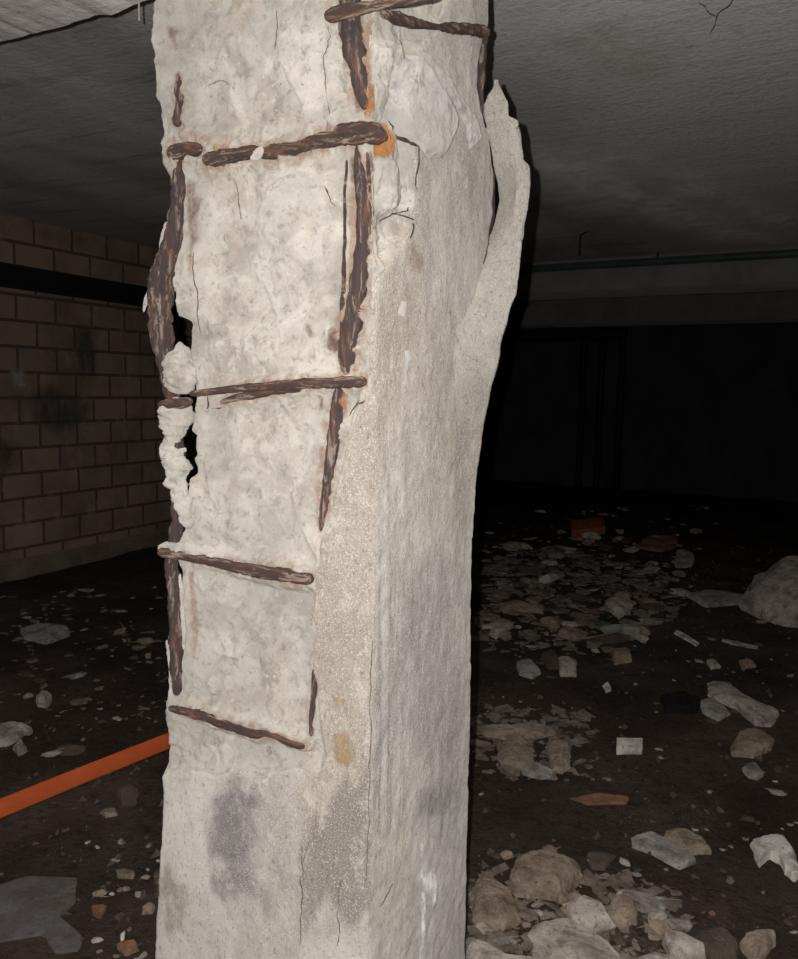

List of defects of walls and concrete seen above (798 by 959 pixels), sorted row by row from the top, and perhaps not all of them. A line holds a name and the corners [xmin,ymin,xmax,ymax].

crack [699,0,733,34]
corrosion [362,32,375,116]
corrosion [352,124,395,181]
crack [379,121,420,238]
spalling [143,0,488,798]
crack [299,842,310,945]
crack [334,882,342,946]